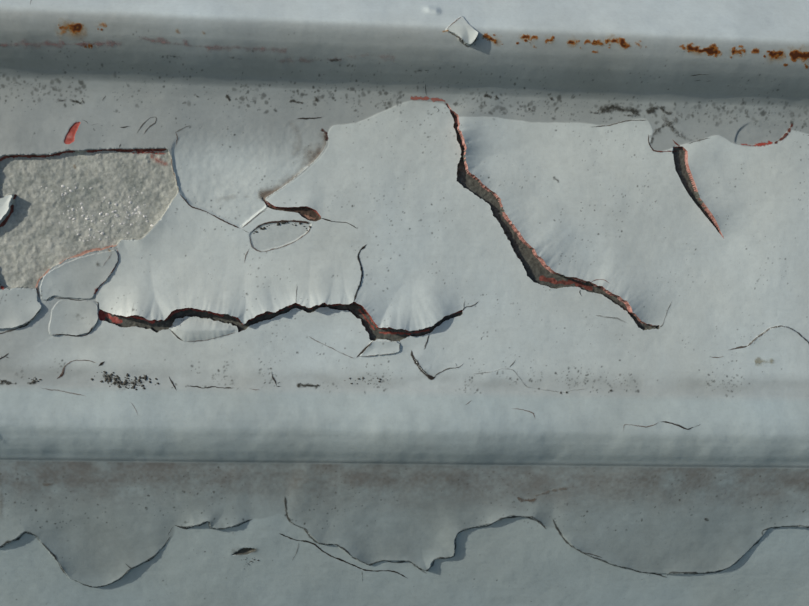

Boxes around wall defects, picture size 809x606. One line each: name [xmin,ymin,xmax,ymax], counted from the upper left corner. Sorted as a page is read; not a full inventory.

rust [58,23,82,34]
peeling [443,17,478,47]
rust [568,38,641,53]
rust [679,43,720,57]
rust [730,45,809,69]
peeling [735,117,793,146]
crack [596,120,724,239]
peeling [0,115,328,337]
crack [263,200,356,228]
crack [436,103,672,330]
crack [98,244,479,380]
spalling [232,548,259,562]